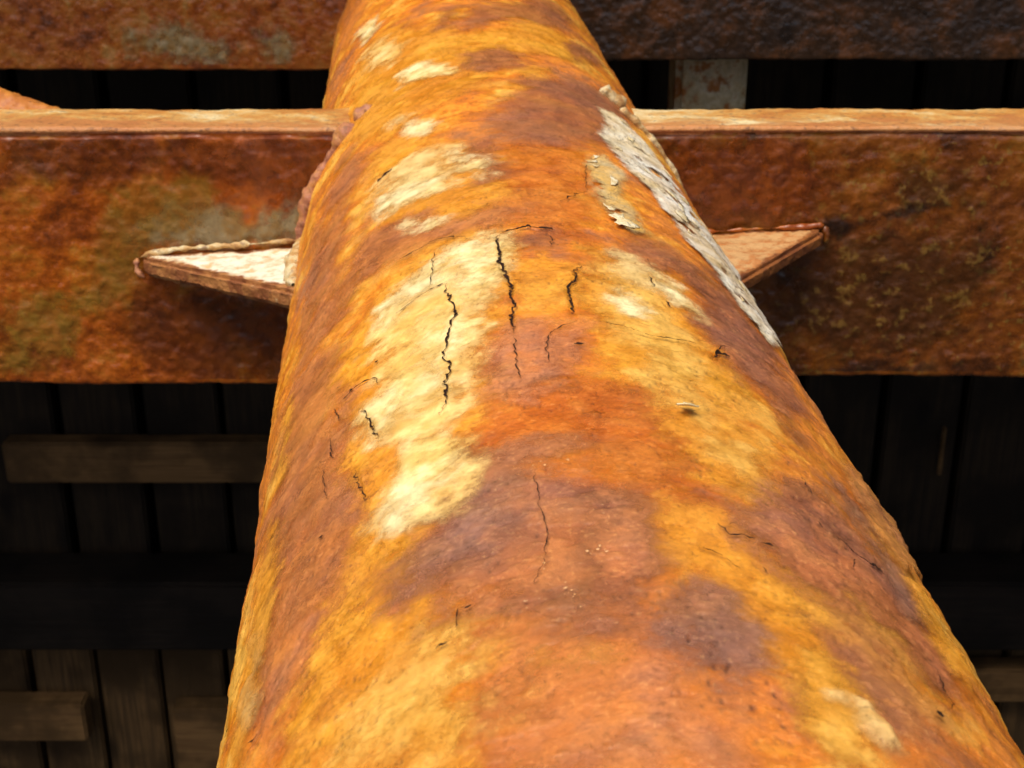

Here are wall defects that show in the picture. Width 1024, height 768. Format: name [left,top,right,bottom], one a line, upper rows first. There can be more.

rust [438,0,605,65]
rust [0,139,323,197]
rust [123,289,287,379]
crack [400,236,467,413]
crack [495,224,555,376]
crack [545,266,582,359]
rust [357,78,806,422]
peeling [586,108,781,344]
rust [662,138,841,224]
crack [322,377,378,497]
crack [533,473,549,583]
rust [237,318,959,768]